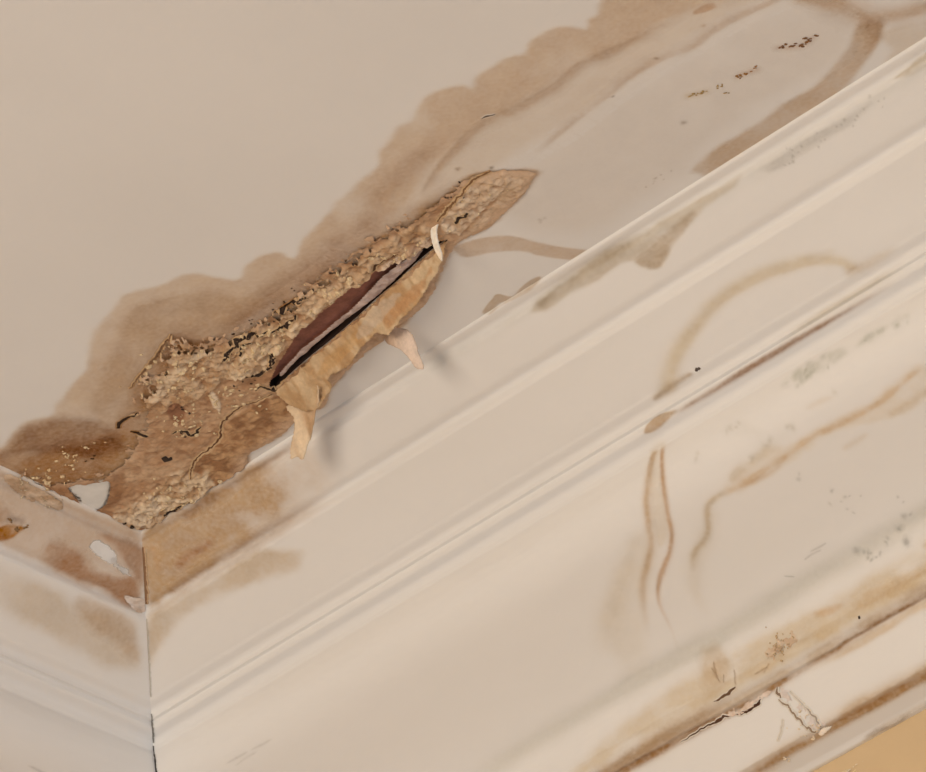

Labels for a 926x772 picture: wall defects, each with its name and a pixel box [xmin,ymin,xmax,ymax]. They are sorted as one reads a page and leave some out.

flaking render [4,169,537,531]
peeling [90,540,131,576]
crack [142,546,158,772]